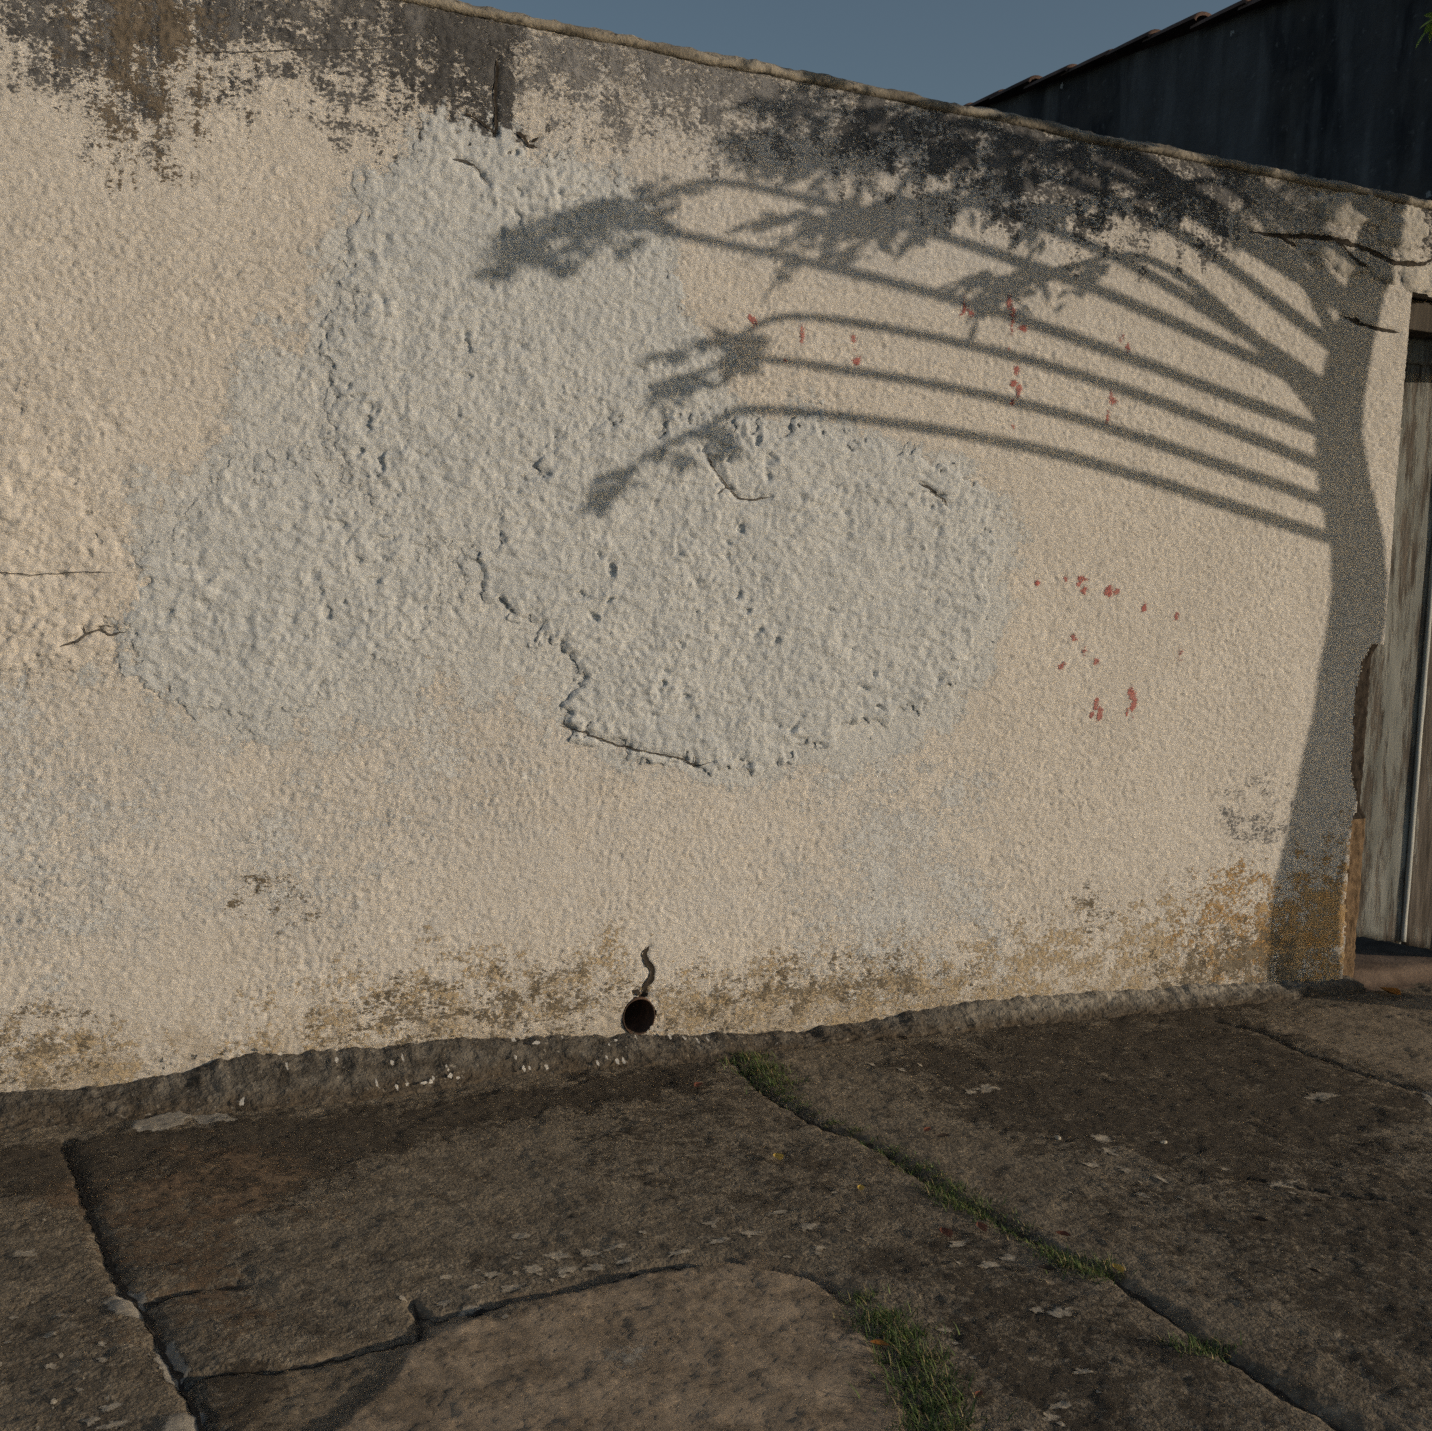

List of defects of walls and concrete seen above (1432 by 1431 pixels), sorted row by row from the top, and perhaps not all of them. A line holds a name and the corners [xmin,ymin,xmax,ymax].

damp [0,0,1276,284]
damp [1420,208,1432,261]
crack [707,455,771,501]
crack [560,725,711,766]
crack [633,946,655,997]
damp [198,848,1271,1058]
crack [736,1066,1346,1431]
crack [65,1143,506,1431]
crack [580,1267,695,1291]